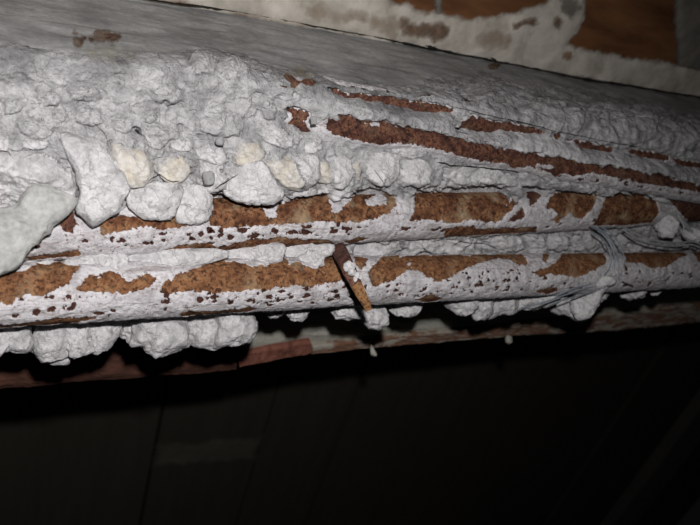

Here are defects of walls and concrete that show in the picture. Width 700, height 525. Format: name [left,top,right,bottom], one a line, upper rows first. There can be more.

rust [286,107,310,132]
rust [331,87,453,113]
spalling [0,41,700,329]
rust [326,114,700,237]
rust [59,212,77,233]
rust [97,194,397,250]
rust [0,245,357,328]
rust [353,253,607,302]
rust [624,252,700,286]